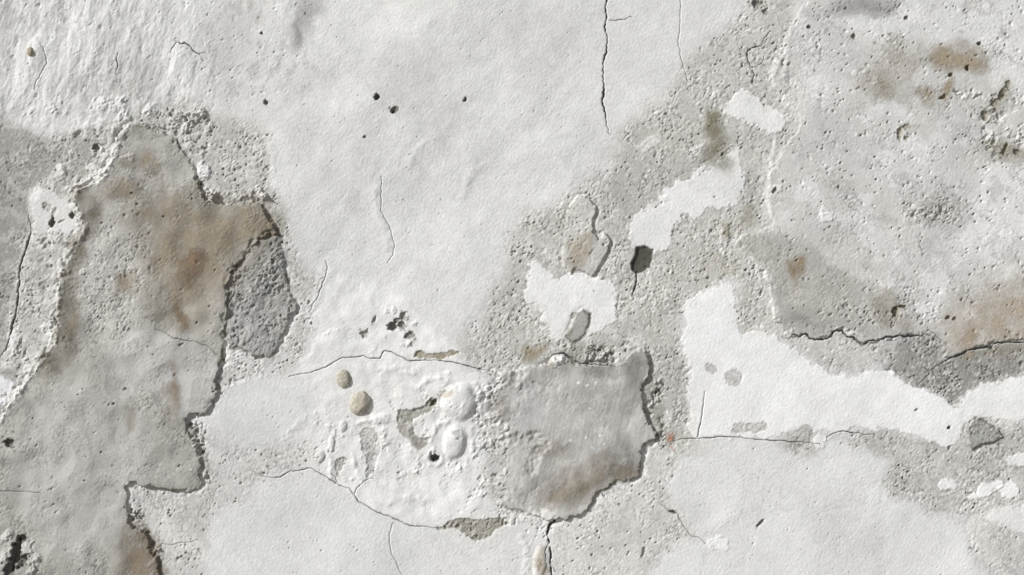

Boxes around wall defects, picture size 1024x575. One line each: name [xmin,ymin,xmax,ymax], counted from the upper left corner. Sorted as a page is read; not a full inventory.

crack [600,0,631,134]
crack [0,215,33,361]
spalling [0,98,322,575]
leakage [135,196,273,310]
crack [289,349,493,378]
crack [545,350,615,368]
peeling [414,0,1024,575]
crack [782,328,1024,384]
crack [670,391,874,446]
crack [253,466,438,575]
crack [543,519,556,575]
crack [659,502,706,544]